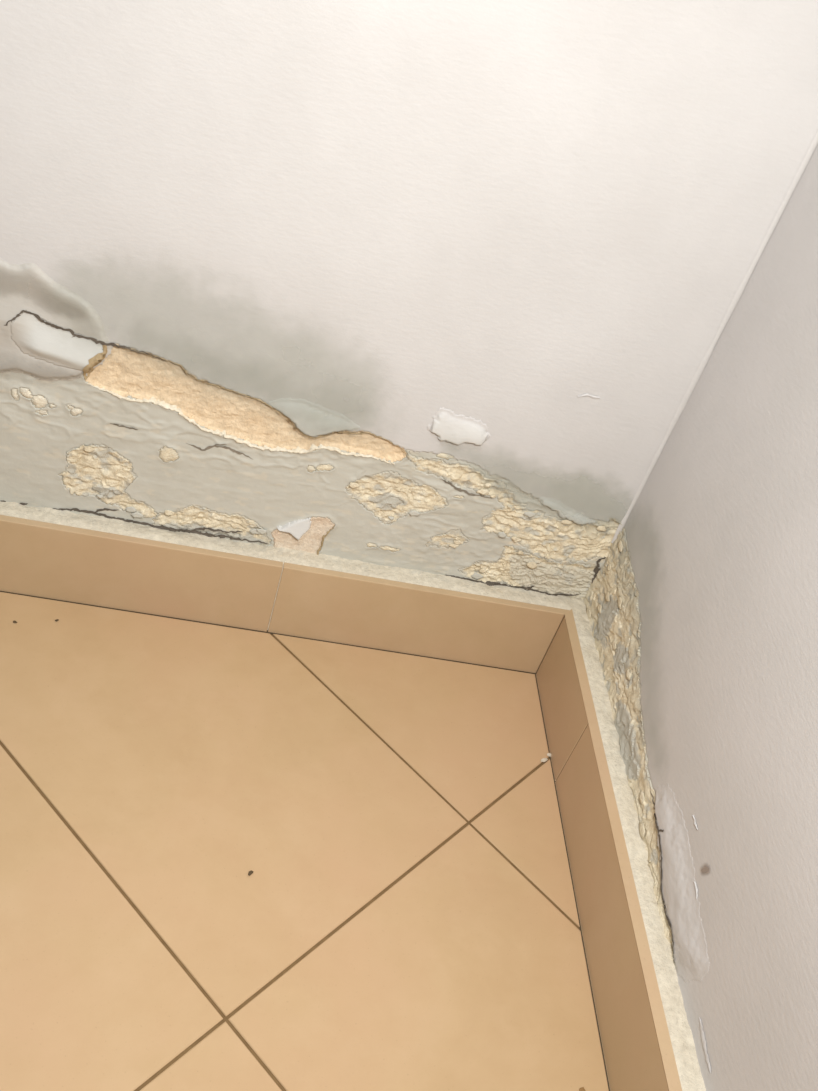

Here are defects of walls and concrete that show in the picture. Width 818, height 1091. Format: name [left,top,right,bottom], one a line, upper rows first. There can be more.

peeling [0,312,676,969]